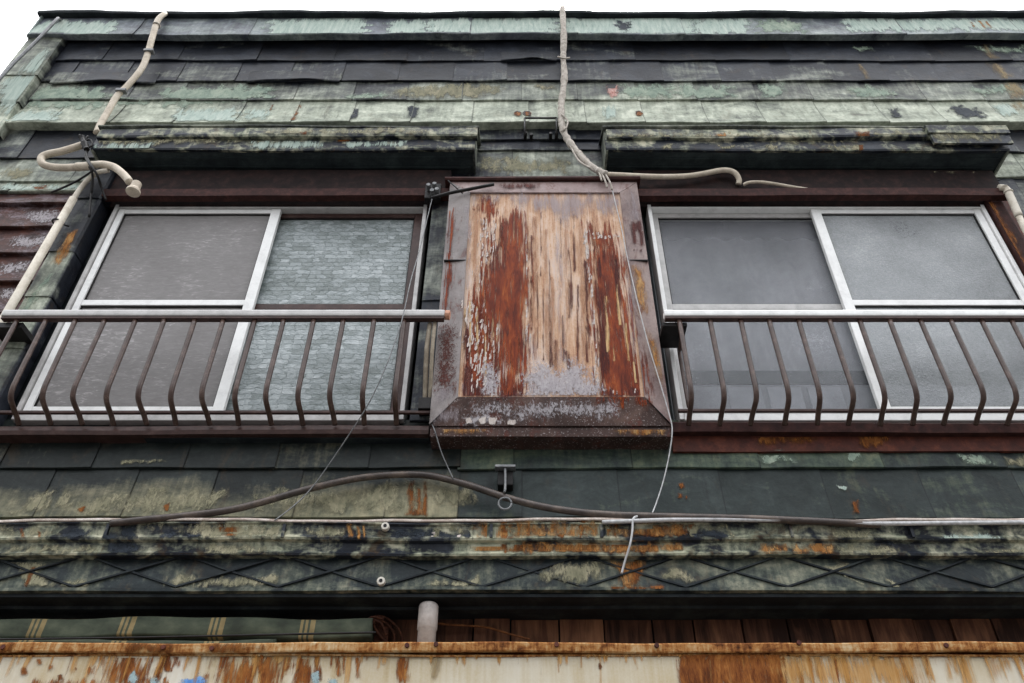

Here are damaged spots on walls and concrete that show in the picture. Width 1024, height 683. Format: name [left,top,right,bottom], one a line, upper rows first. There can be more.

leakage [29,19,121,35]
leakage [260,18,806,35]
leakage [842,18,1024,33]
leakage [0,48,429,150]
leakage [623,83,737,102]
rust [433,194,661,409]
peeling [459,219,636,426]
leakage [11,488,279,554]
rust [475,520,694,589]
rust [762,543,833,554]
rust [0,643,409,683]
rust [676,654,935,683]